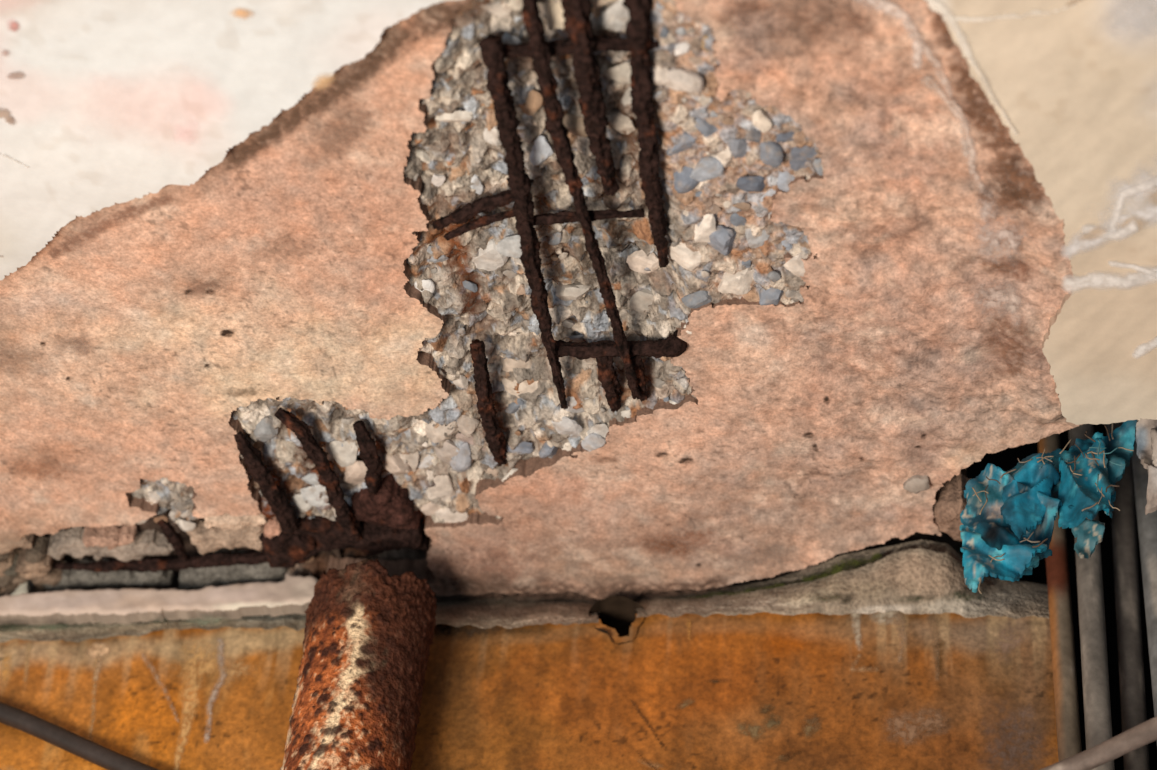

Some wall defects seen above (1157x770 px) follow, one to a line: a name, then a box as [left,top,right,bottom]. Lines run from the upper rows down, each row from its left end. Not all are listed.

corrosion [470,339,507,467]
flaking render [0,0,1083,644]
corrosion [427,0,688,412]
leakage [1063,261,1157,291]
leakage [1082,178,1157,240]
corrosion [51,407,430,573]